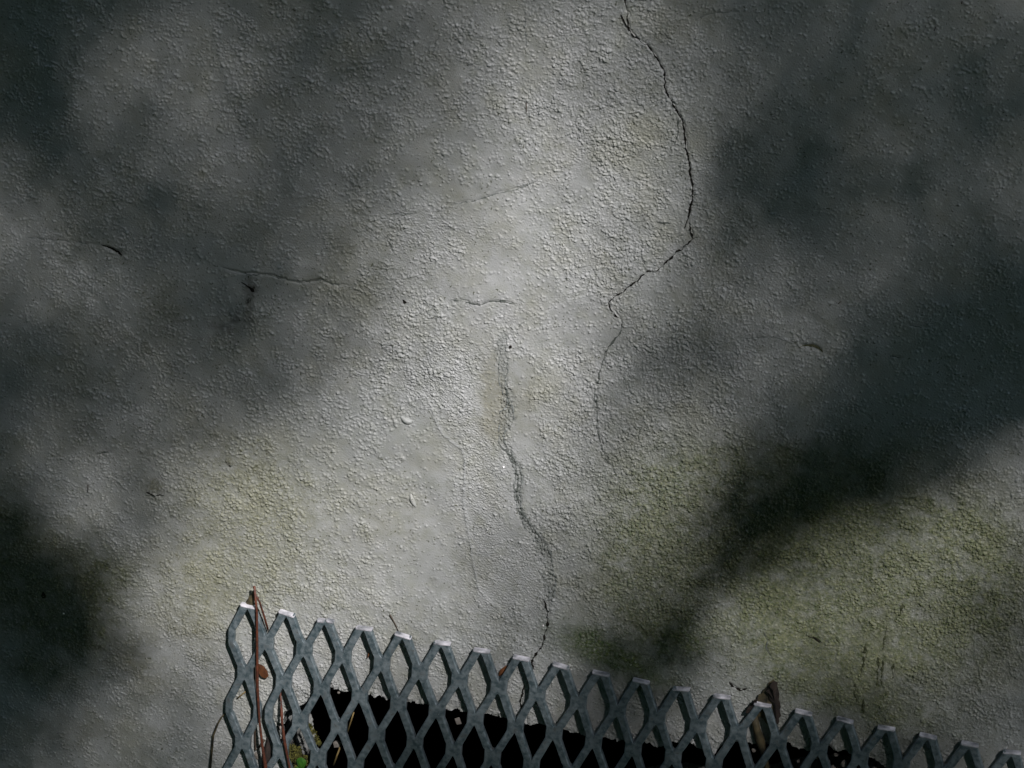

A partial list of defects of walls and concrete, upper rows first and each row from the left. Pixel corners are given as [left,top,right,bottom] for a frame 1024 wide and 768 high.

crack [592,0,697,476]
crack [452,299,557,708]